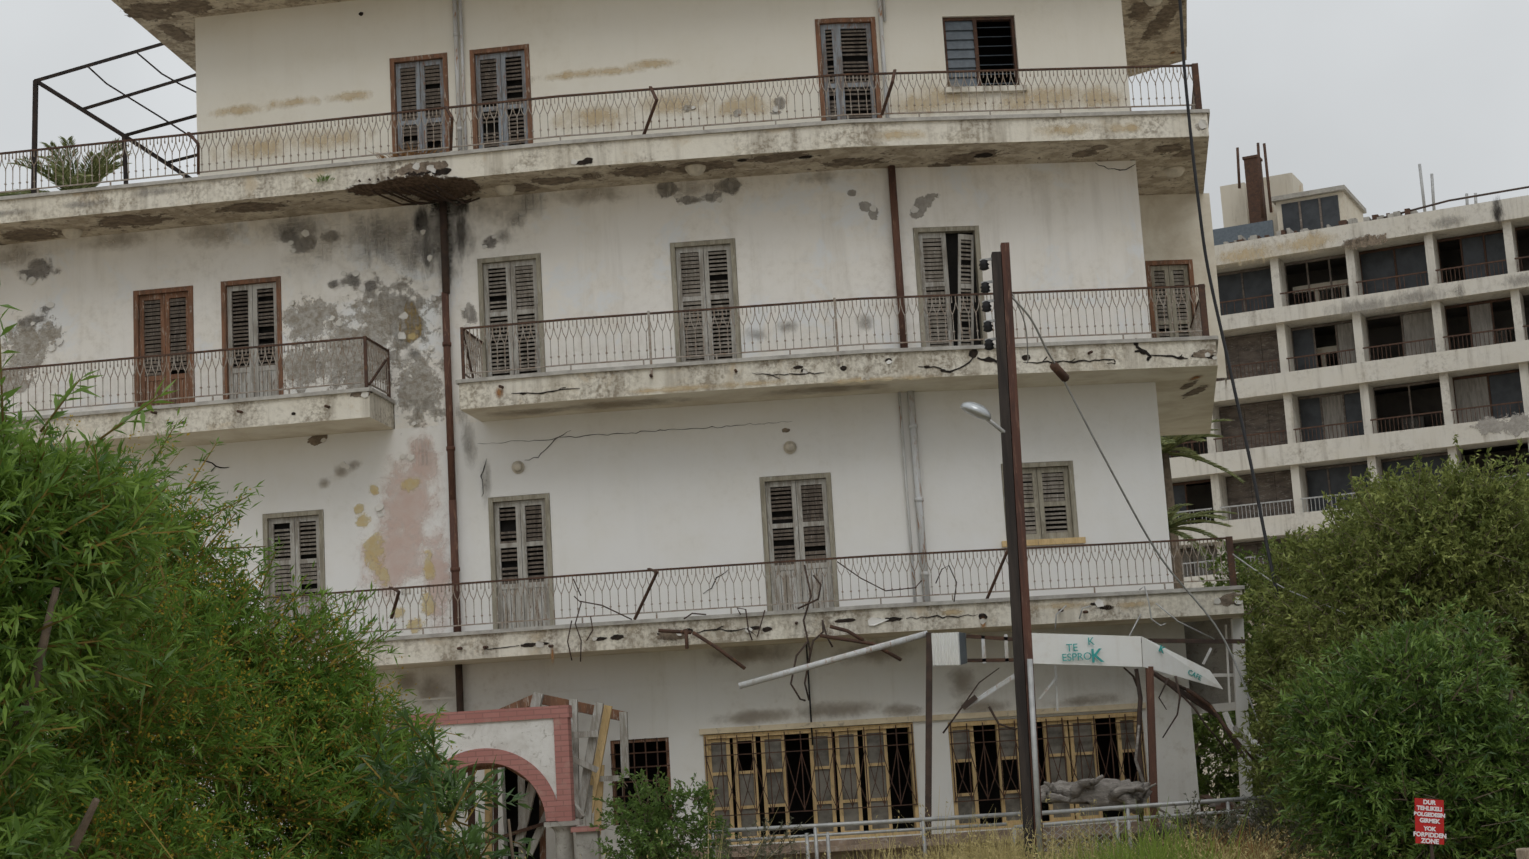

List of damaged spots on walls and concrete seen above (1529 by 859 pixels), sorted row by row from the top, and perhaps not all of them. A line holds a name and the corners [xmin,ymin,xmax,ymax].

spalling [91,213,175,229]
spalling [0,228,63,285]
peeling [0,302,64,403]
peeling [215,202,450,633]
peeling [460,303,477,367]
crack [511,387,580,395]
crack [753,371,823,379]
crack [918,338,1188,373]
crack [478,421,791,495]